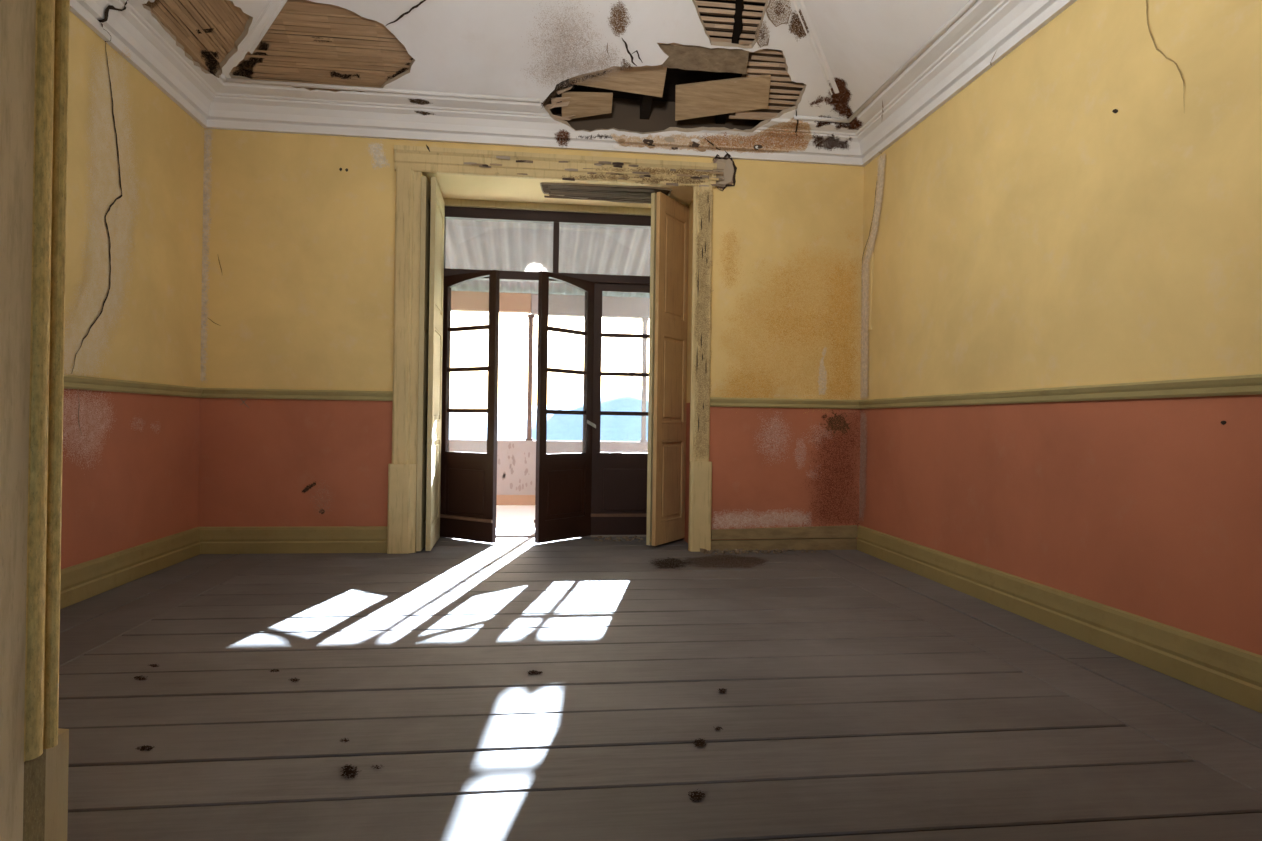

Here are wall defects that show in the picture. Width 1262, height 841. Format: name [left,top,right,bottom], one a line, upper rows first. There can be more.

flaking render [142,0,415,92]
crack [386,0,426,26]
crack [1146,0,1184,98]
peeling [464,156,533,176]
crack [72,0,128,434]
flaking render [540,0,813,459]
leakage [712,226,863,530]